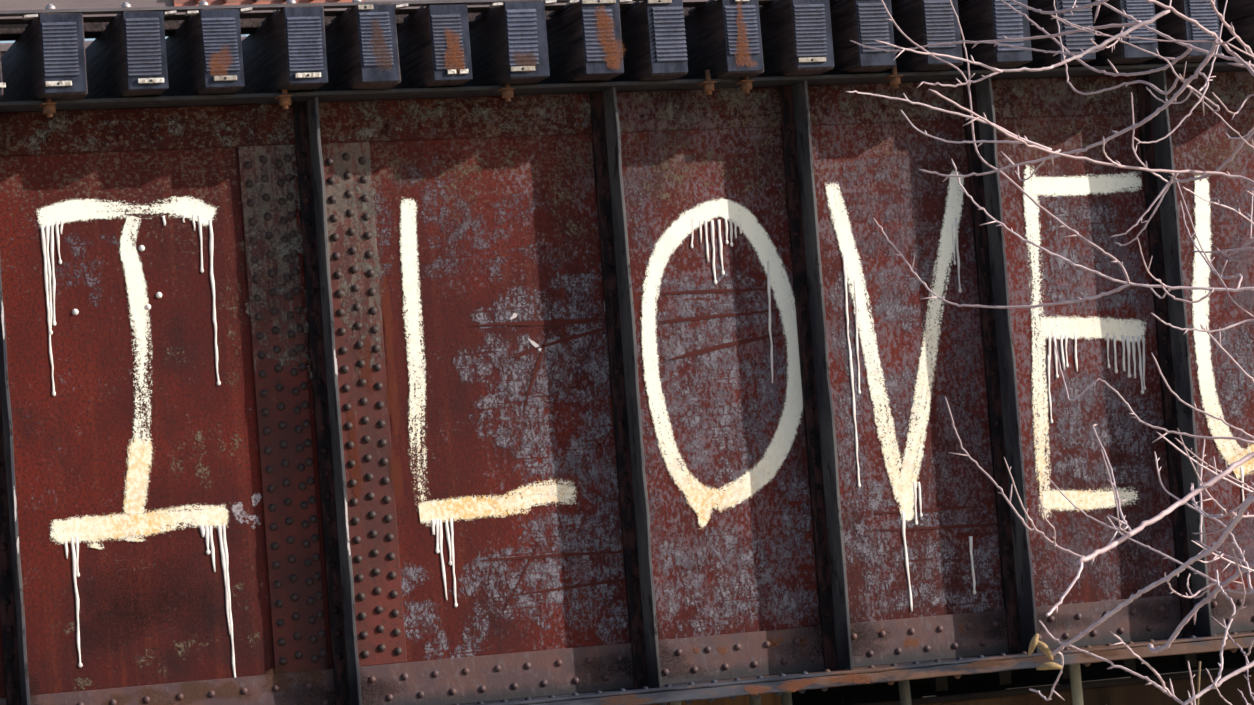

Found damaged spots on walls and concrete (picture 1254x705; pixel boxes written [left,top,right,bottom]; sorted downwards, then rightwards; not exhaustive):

rust [442,27,466,75]
rust [594,4,625,72]
rust [735,1,758,68]
rust [356,269,404,510]
rust [743,673,876,695]